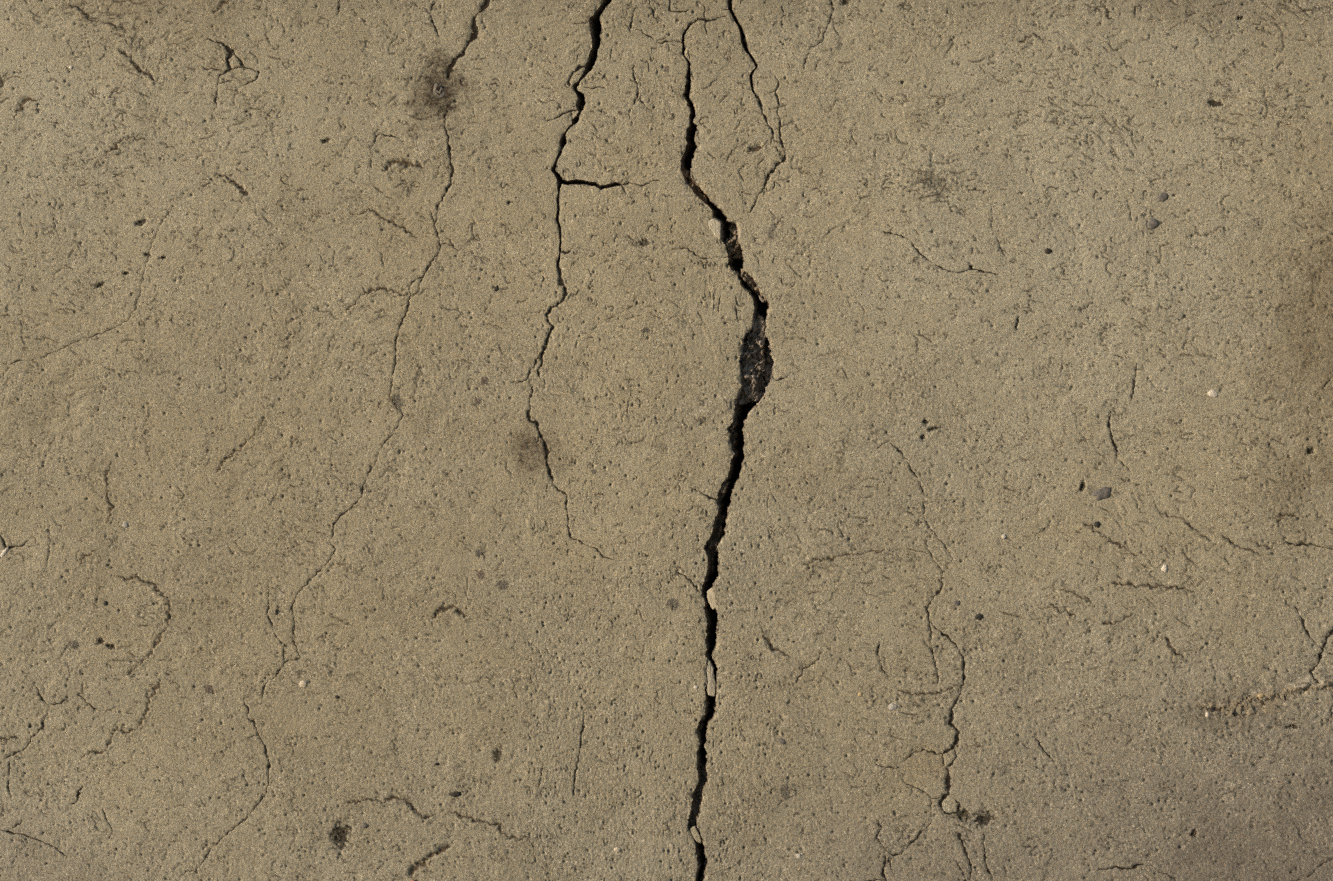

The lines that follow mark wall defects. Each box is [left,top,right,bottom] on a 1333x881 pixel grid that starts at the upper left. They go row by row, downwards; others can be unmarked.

crack [183,0,490,875]
crack [511,0,834,881]
crack [0,527,51,560]
crack [1286,541,1333,550]
crack [869,442,993,881]
crack [1295,607,1333,716]
crack [2,684,97,856]
crack [71,787,112,838]